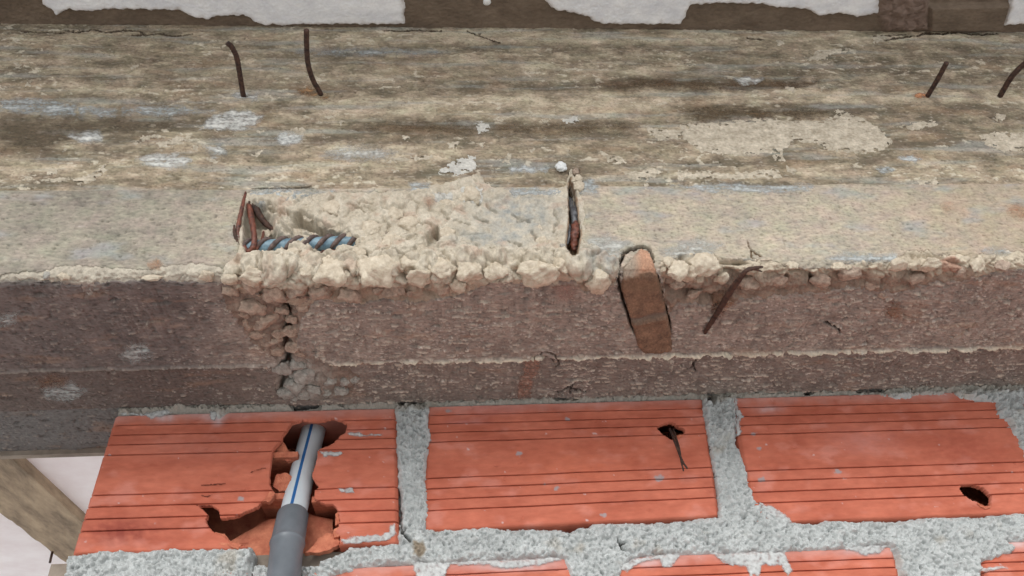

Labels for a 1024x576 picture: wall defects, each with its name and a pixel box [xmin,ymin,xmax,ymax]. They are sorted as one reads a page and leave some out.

peeling [646,109,892,181]
spalling [0,121,620,307]
hole [202,442,299,555]
hole [303,481,341,556]
hole [960,487,991,510]